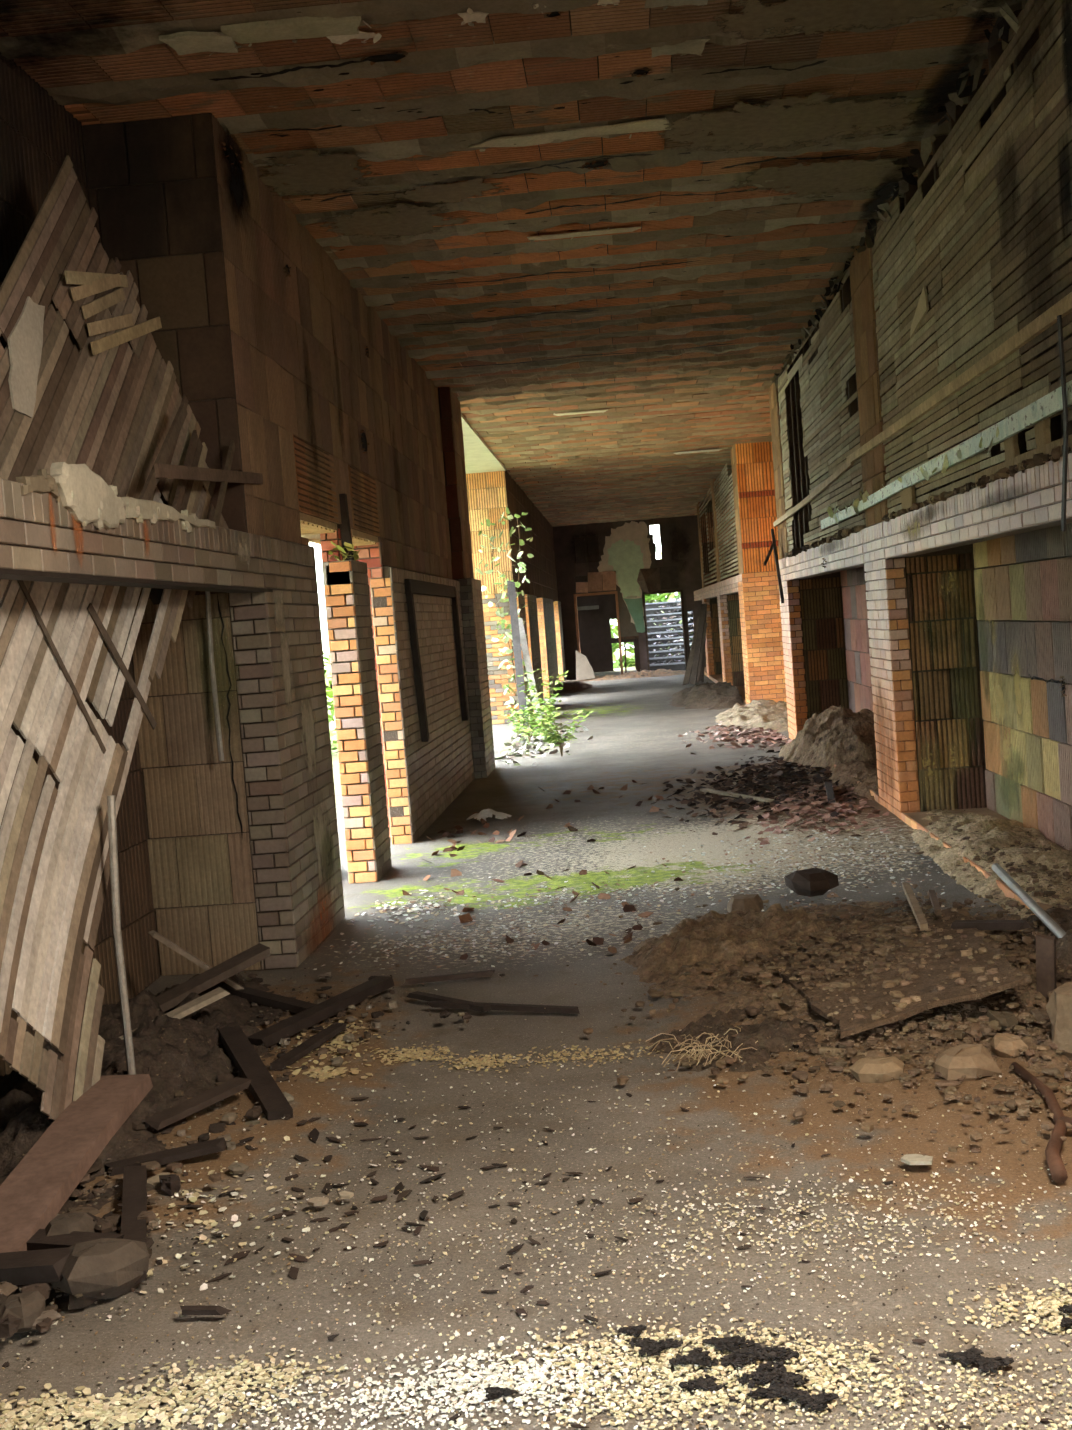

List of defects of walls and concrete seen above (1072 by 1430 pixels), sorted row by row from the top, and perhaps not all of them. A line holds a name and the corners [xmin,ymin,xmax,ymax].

peeling [327,21,382,45]
peeling [620,37,710,84]
peeling [644,0,708,10]
damp [1023,0,1072,113]
damp [1025,145,1072,314]
spalling [16,462,216,533]
flaking render [597,521,652,633]